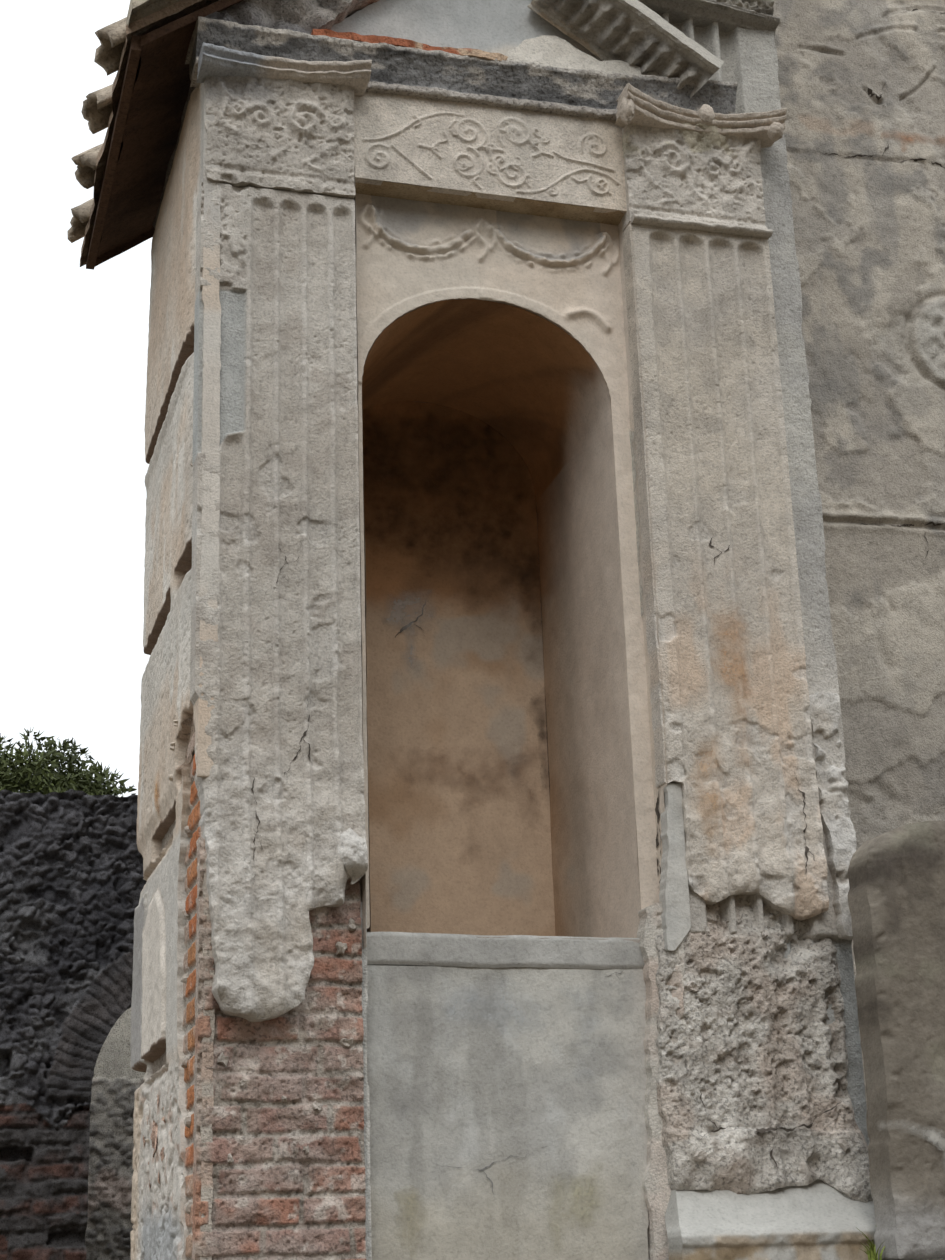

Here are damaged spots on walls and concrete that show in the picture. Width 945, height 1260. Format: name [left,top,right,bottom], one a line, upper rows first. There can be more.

spalling [655,895,873,1203]